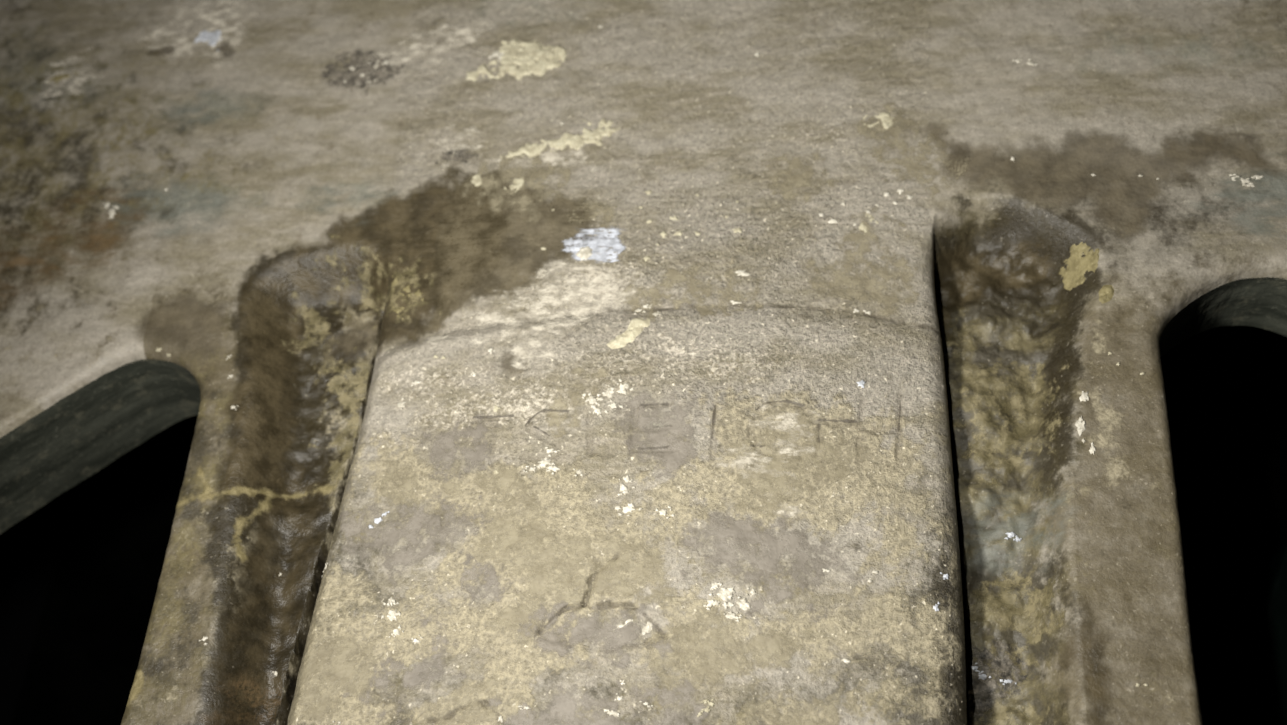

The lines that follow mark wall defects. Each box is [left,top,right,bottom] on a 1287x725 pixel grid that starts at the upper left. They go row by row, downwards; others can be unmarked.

peeling [322,50,404,94]
leakage [948,136,1287,233]
peeling [576,246,593,261]
leakage [934,234,1050,334]
leakage [218,129,636,725]
crack [176,469,333,561]
leakage [1062,623,1108,725]